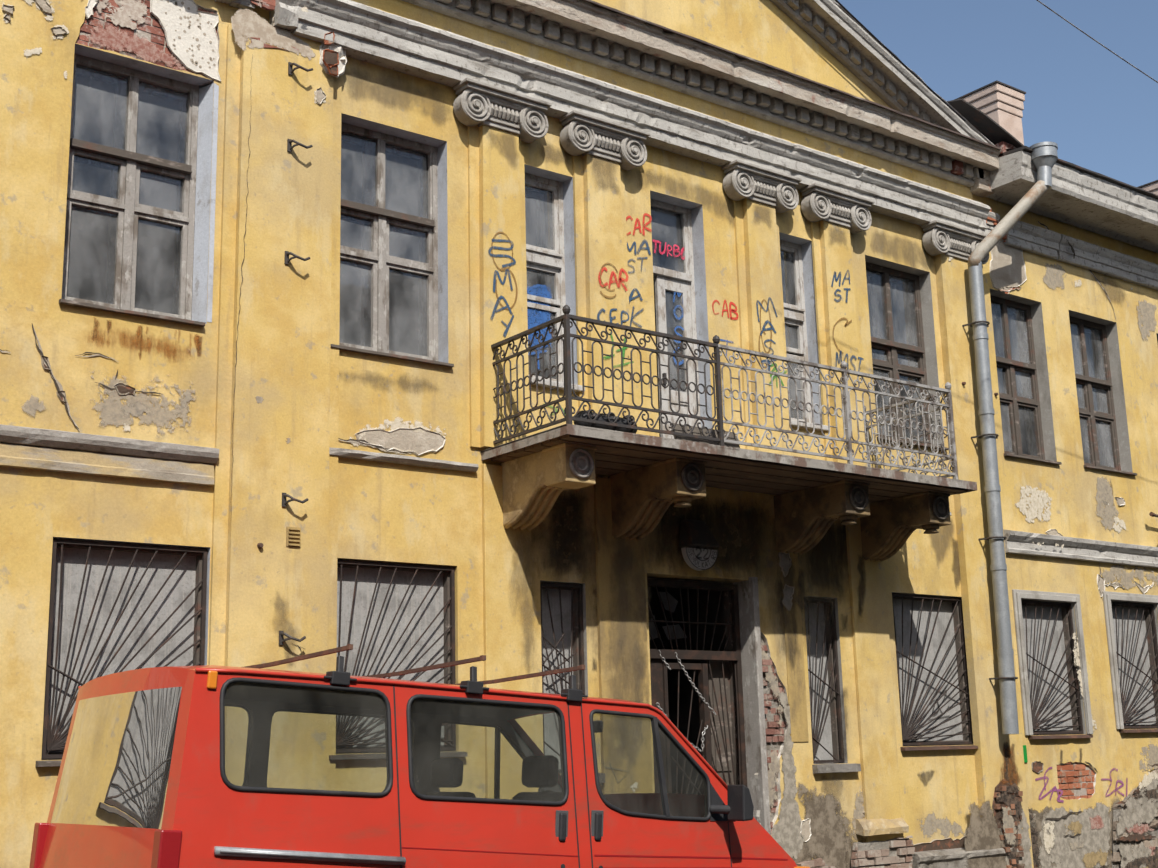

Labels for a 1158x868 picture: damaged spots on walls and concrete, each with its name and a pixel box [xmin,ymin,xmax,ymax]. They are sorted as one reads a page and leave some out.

flaking render [2,0,219,78]
peeling [231,0,315,60]
spalling [986,209,1027,295]
crack [0,324,161,431]
corrosion [92,321,176,358]
peeling [90,371,195,434]
leakage [550,495,582,571]
leakage [658,500,760,566]
peeling [1097,564,1158,597]
flaking render [761,636,787,833]
flaking render [1057,762,1095,800]
flaking render [992,779,1037,868]